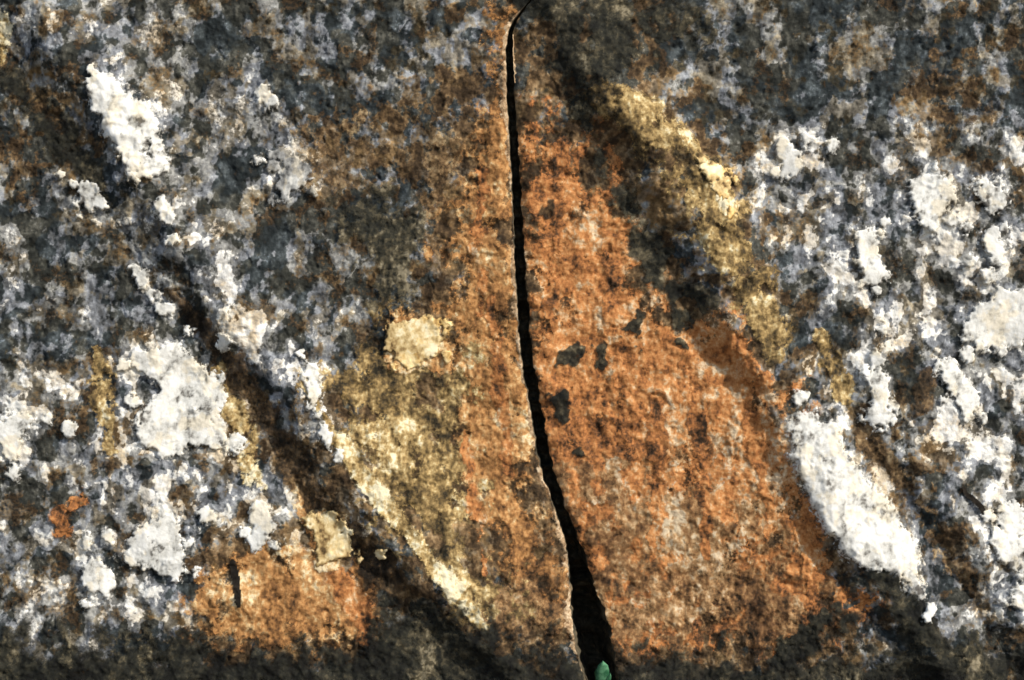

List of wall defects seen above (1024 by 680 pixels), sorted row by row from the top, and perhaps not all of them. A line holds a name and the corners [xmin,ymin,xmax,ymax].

rust [175,483,380,660]
crack [496,0,619,680]
rust [423,1,885,668]